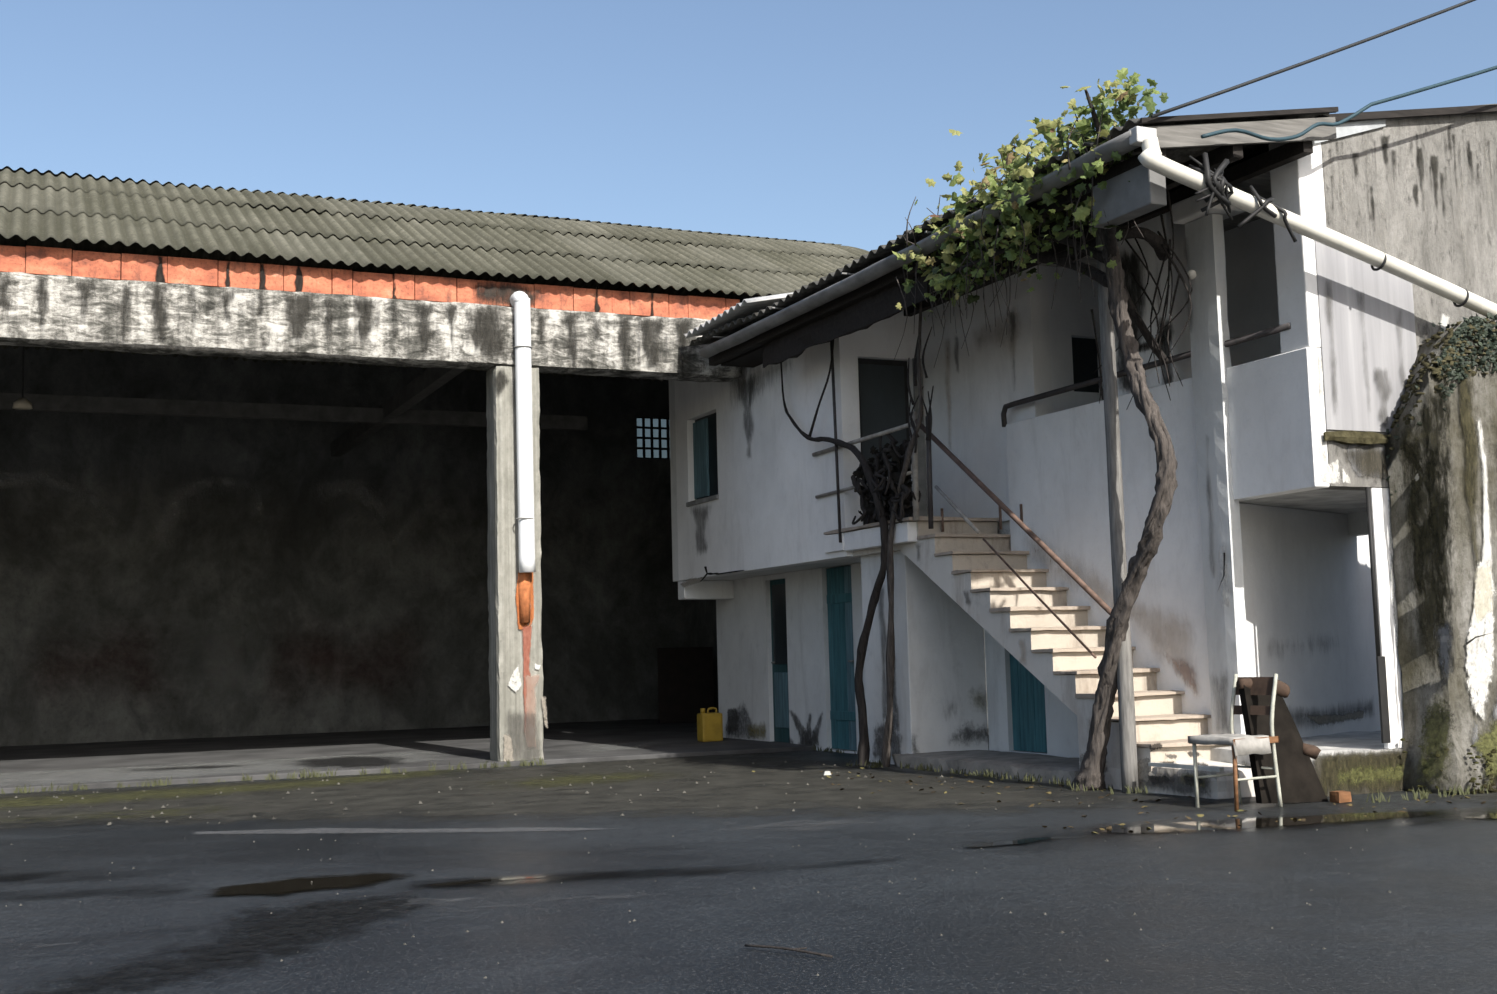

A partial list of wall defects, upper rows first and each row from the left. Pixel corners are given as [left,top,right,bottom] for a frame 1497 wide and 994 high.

damp [1382,127,1490,209]
damp [38,278,49,323]
damp [118,285,130,340]
damp [147,256,167,347]
damp [223,261,234,319]
damp [258,264,266,314]
damp [286,266,332,339]
damp [354,298,374,340]
damp [416,283,600,400]
damp [619,290,691,372]
damp [1458,359,1480,566]
rust [516,572,539,747]